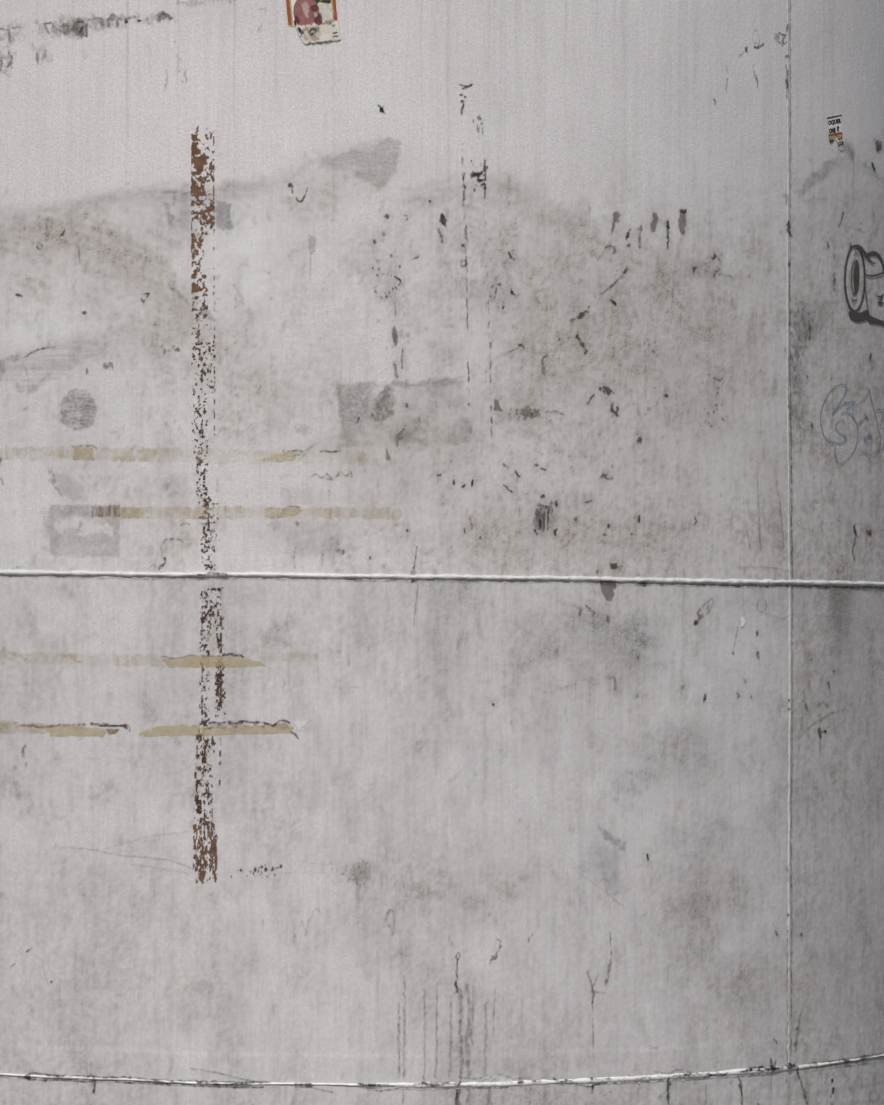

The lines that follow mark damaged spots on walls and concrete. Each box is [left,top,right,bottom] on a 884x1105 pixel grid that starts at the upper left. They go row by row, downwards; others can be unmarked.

corrosion [190,126,218,570]
corrosion [193,587,226,883]